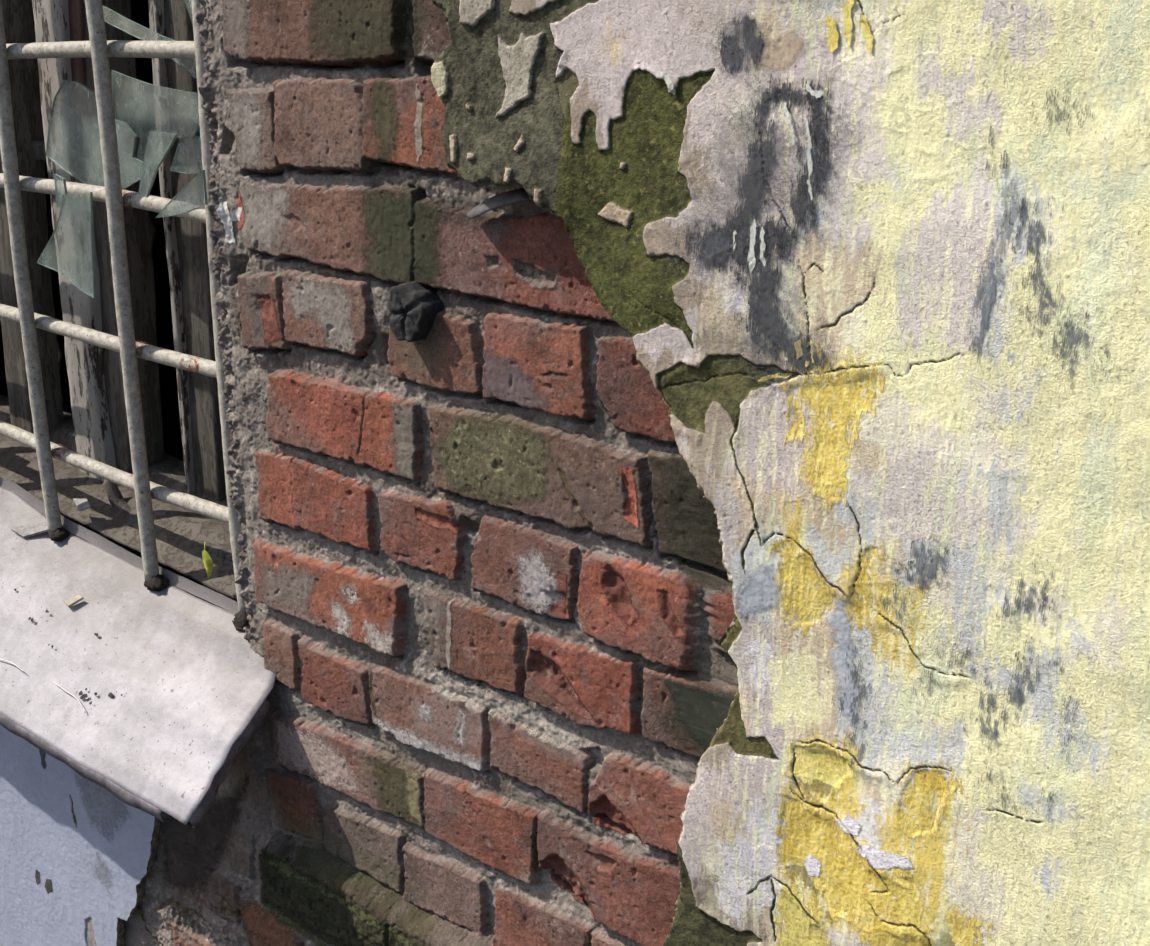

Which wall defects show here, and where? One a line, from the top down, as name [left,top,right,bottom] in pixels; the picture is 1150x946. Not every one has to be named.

flaking render [431,0,715,348]
crack [666,372,762,387]
peeling [657,355,896,511]
crack [791,263,959,377]
crack [730,415,862,597]
flaking render [709,617,772,758]
crack [878,613,967,677]
spalling [538,852,596,922]
spalling [588,793,642,842]
crack [748,877,819,941]
peeling [664,731,996,946]
crack [791,739,950,946]